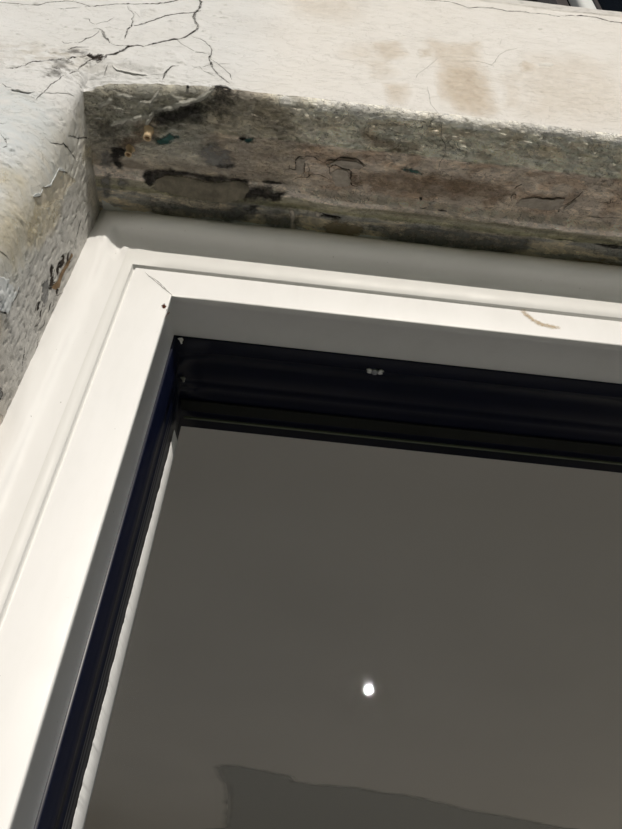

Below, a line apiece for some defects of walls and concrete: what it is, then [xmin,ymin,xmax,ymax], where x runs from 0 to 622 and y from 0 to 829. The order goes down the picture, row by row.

crack [0,0,232,99]
leakage [154,85,231,125]
peeling [33,168,75,208]
leakage [95,121,142,196]
leakage [143,143,297,229]
peeling [289,156,366,187]
leakage [370,226,528,253]
spalling [35,212,89,327]
peeling [0,276,20,314]